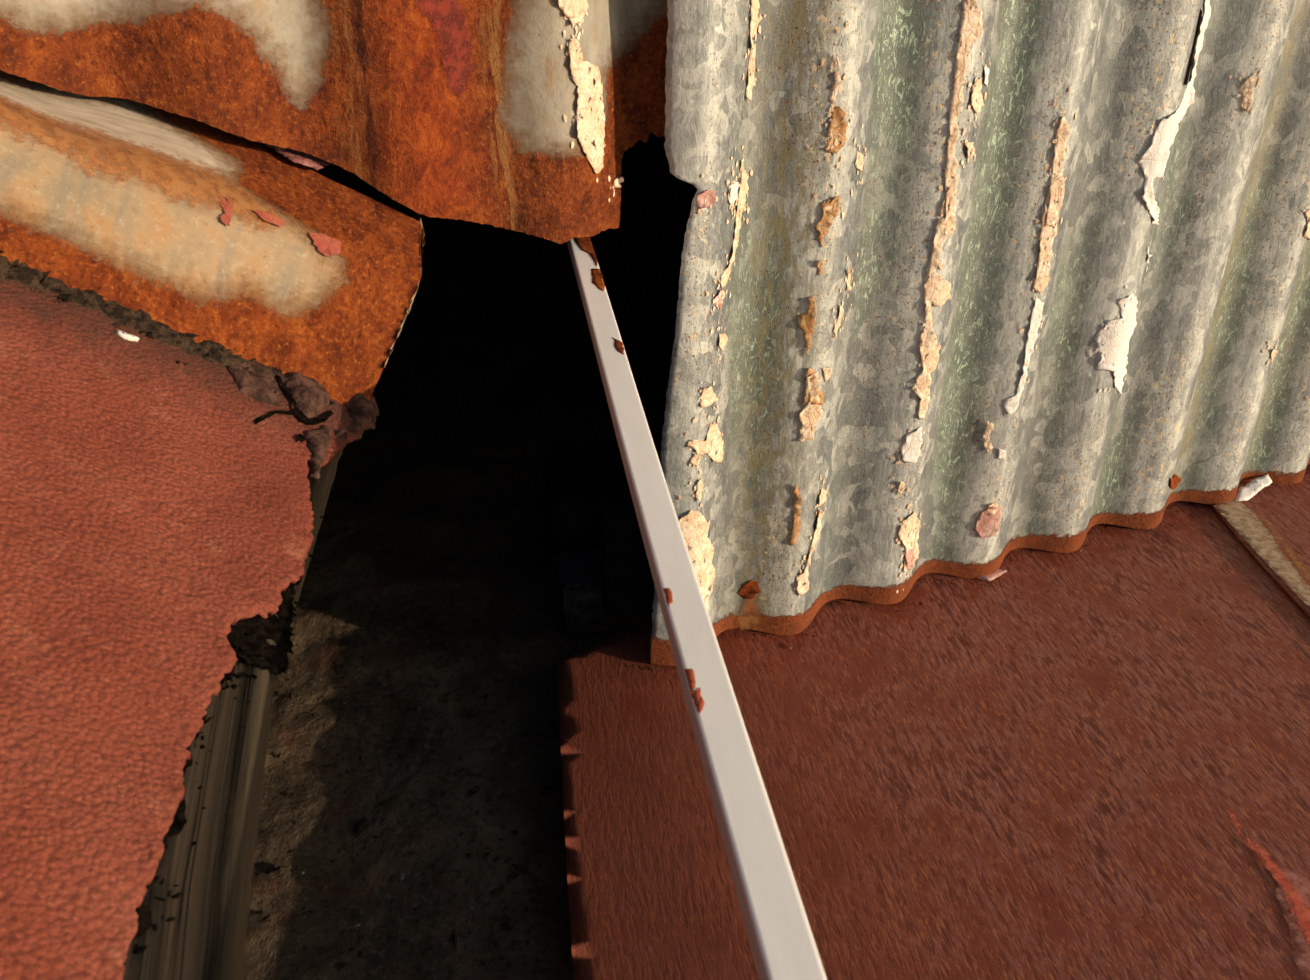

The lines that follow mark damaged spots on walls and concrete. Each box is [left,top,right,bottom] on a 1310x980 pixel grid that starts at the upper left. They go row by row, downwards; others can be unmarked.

corrosion [0,0,668,406]
peeling [558,0,624,202]
peeling [696,146,753,364]
peeling [887,0,991,593]
peeling [982,87,1077,459]
peeling [1089,243,1153,394]
peeling [1138,0,1211,225]
crack [1184,9,1203,85]
corrosion [663,588,673,606]
corrosion [651,636,704,714]
peeling [679,382,724,611]
corrosion [713,459,1310,637]